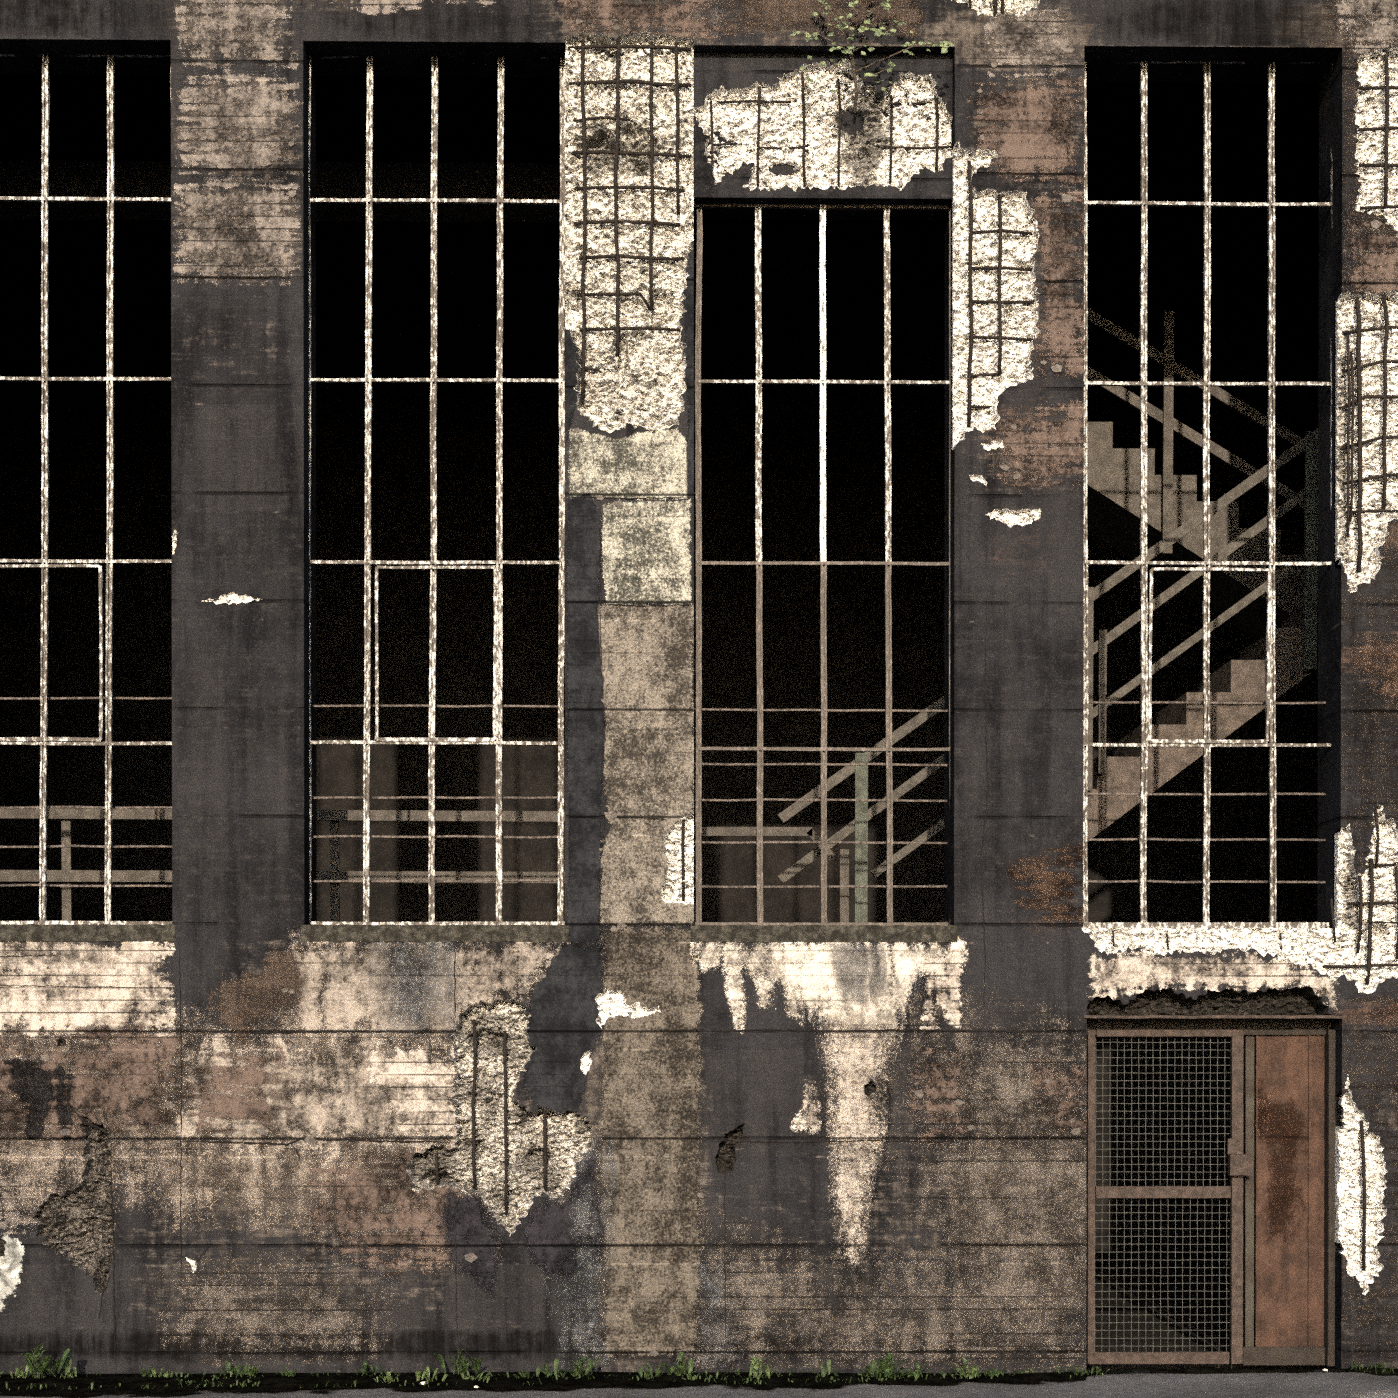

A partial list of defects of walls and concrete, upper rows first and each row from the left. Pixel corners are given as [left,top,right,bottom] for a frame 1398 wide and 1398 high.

peeling [0,0,1087,1369]
leakage [690,937,968,1264]
spalling [1081,0,1398,1368]
corrosion [1254,1079,1308,1244]